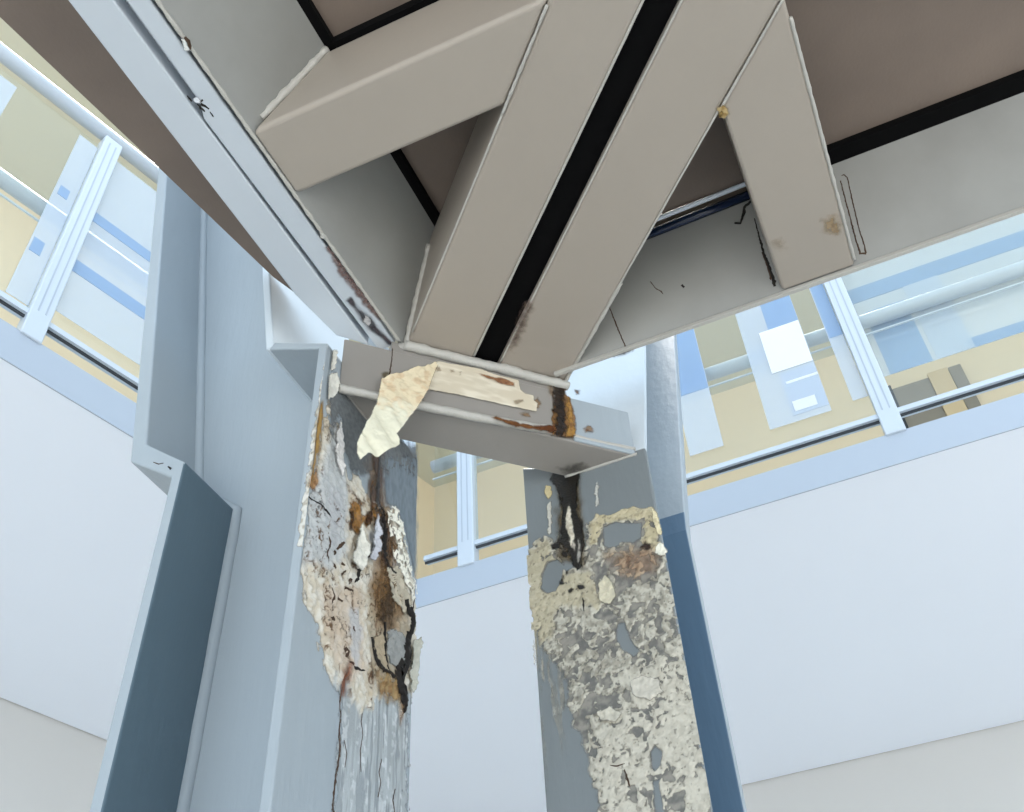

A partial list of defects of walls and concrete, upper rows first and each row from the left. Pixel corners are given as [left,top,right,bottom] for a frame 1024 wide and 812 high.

rust [320,233,392,345]
crack [754,218,776,287]
crack [840,174,867,255]
rust [493,386,593,437]
peeling [297,350,423,812]
crack [308,496,416,812]
rust [348,455,403,626]
peeling [526,483,711,812]